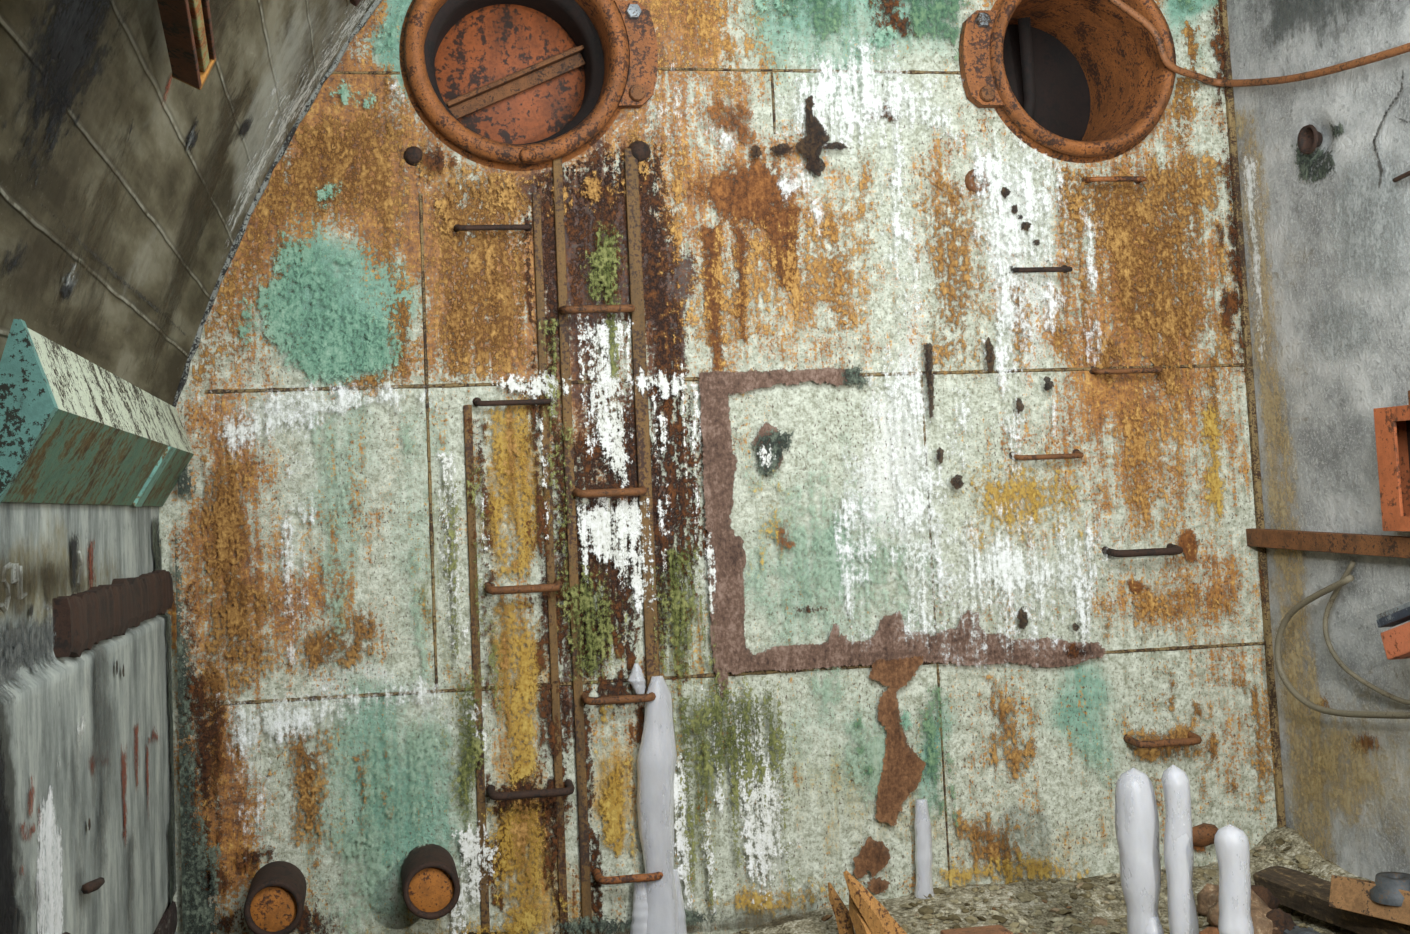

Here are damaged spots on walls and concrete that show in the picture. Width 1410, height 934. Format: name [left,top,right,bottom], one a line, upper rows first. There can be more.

damp [4,0,125,187]
peeling [751,0,974,60]
peeling [316,178,342,214]
peeling [218,231,408,642]
damp [239,383,425,429]
corrosion [182,0,1249,934]
peeling [403,451,490,680]
damp [496,221,807,934]
peeling [466,697,492,756]
corrosion [1212,673,1276,811]
damp [0,738,84,934]